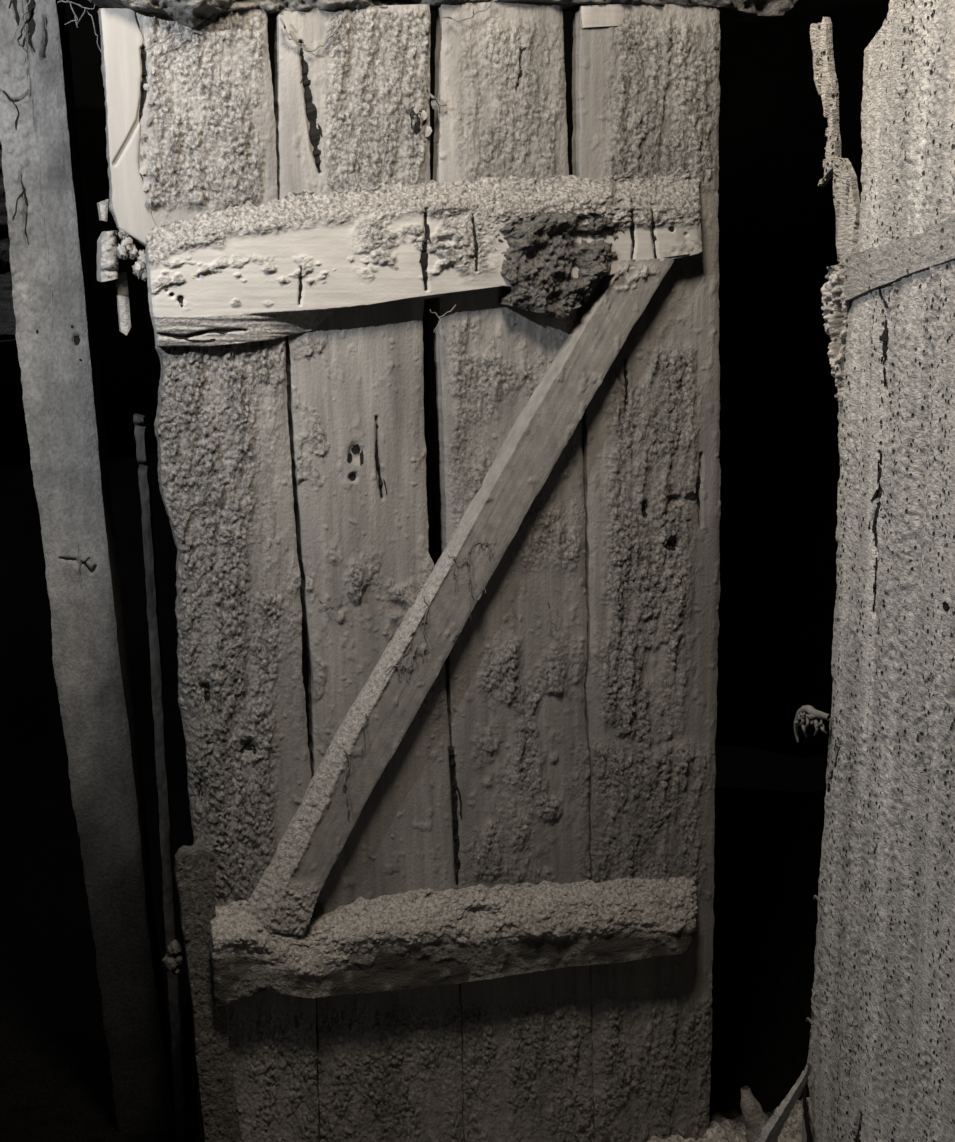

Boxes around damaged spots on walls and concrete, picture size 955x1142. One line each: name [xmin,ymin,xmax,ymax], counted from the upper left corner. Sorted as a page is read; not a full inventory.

crack [878,287,889,403]
crack [868,453,883,611]